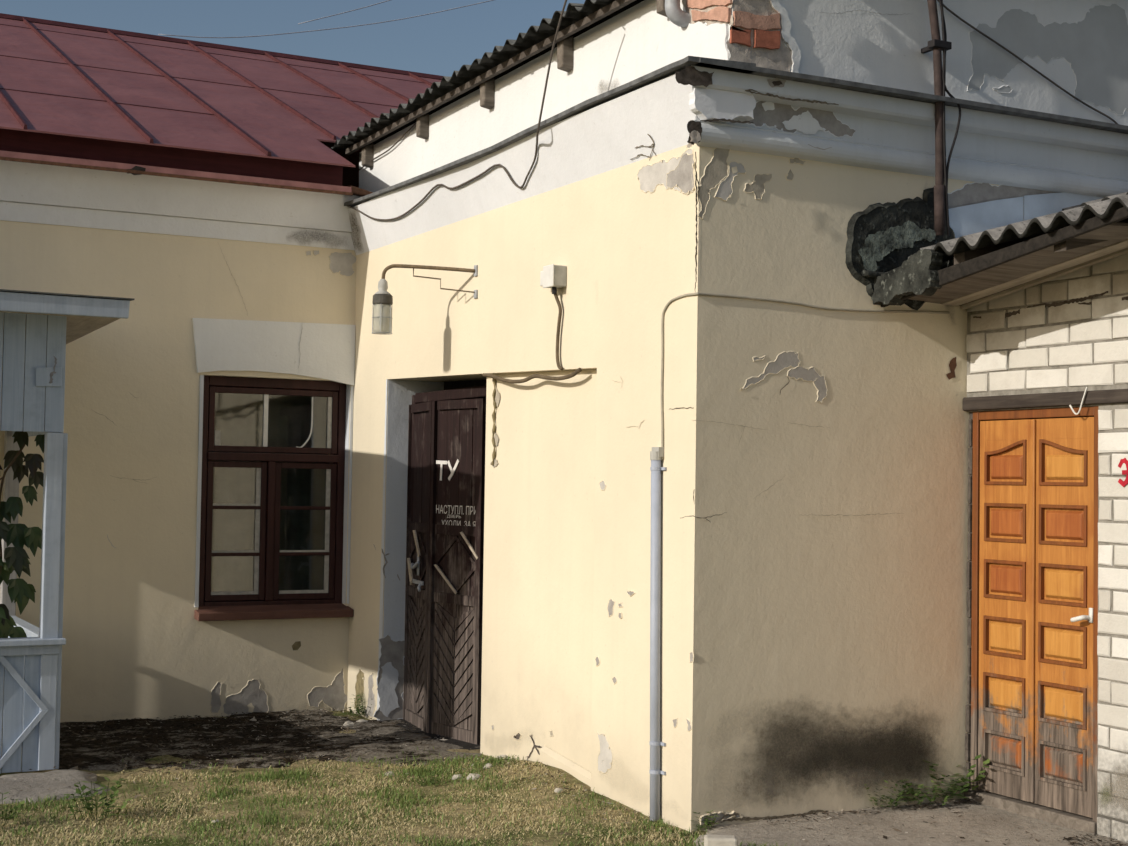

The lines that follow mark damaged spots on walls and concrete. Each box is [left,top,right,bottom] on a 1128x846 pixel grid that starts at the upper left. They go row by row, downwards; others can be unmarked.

spalling [672,0,801,88]
peeling [967,3,1128,116]
peeling [746,101,856,138]
peeling [636,120,806,220]
peeling [740,351,828,404]
peeling [210,679,269,716]
peeling [307,634,405,721]
damp [754,716,931,797]